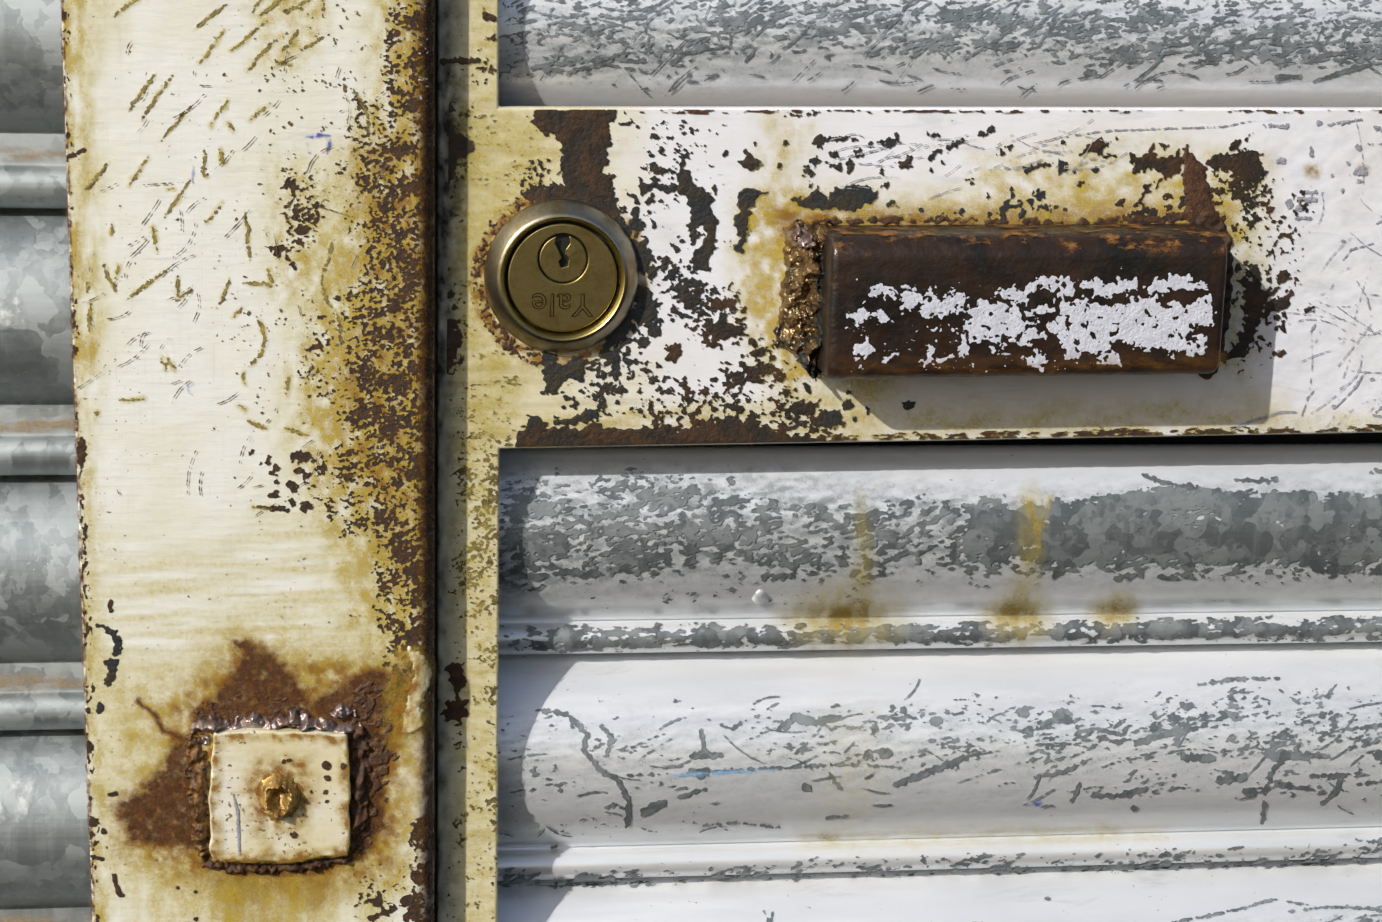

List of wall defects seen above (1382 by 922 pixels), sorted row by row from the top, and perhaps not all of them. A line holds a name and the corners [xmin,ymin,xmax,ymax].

peeling [459,0,1382,90]
peeling [1214,110,1382,133]
peeling [965,137,1118,224]
peeling [1285,144,1368,220]
peeling [515,109,1049,428]
corrosion [447,99,1318,466]
peeling [845,268,1217,372]
spalling [248,0,434,734]
corrosion [810,599,870,634]
peeling [353,390,1382,922]
corrosion [996,593,1037,627]
spalling [310,761,347,803]